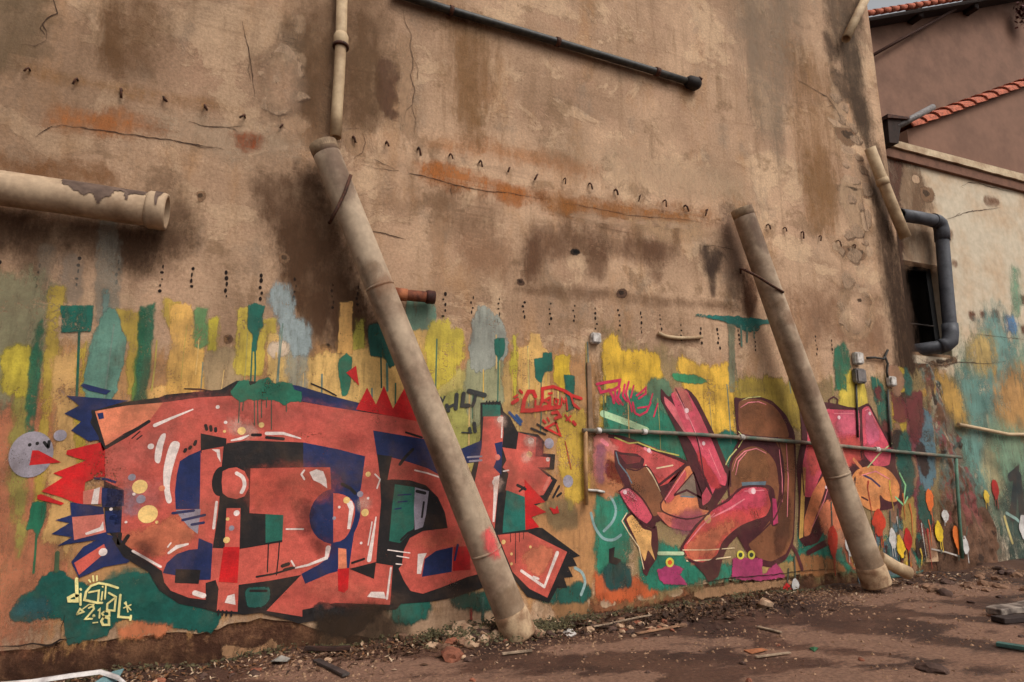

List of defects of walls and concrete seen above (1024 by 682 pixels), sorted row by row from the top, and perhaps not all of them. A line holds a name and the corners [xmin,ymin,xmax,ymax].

crack [37,121,238,150]
water stain [255,166,379,344]
water stain [376,59,400,119]
crack [403,12,418,134]
crack [349,128,730,258]
corrosion [421,162,696,224]
water stain [524,229,665,277]
peeling [827,81,873,261]
water stain [824,0,918,388]